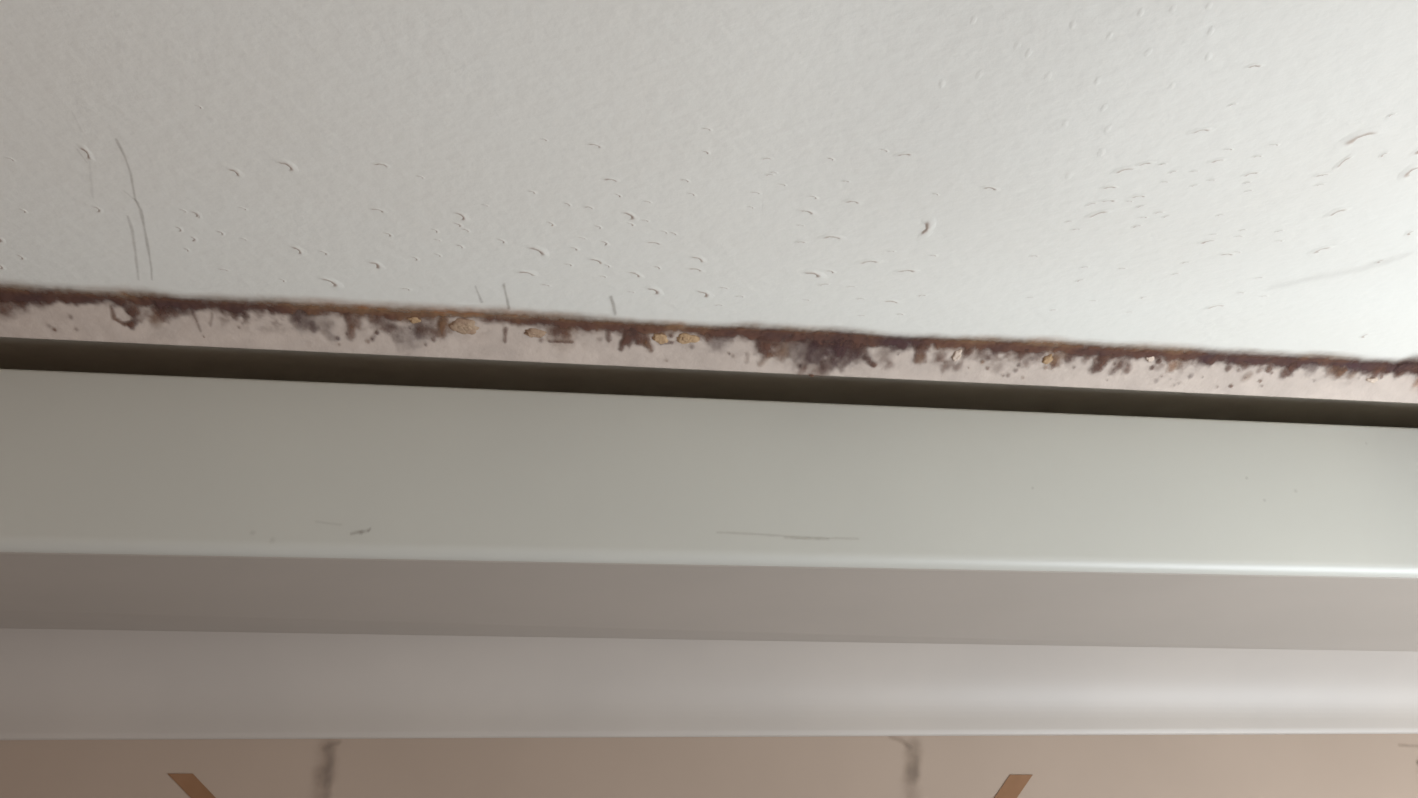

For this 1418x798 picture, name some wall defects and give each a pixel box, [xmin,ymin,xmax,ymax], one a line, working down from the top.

peeling [449,318,480,335]
peeling [652,333,700,344]